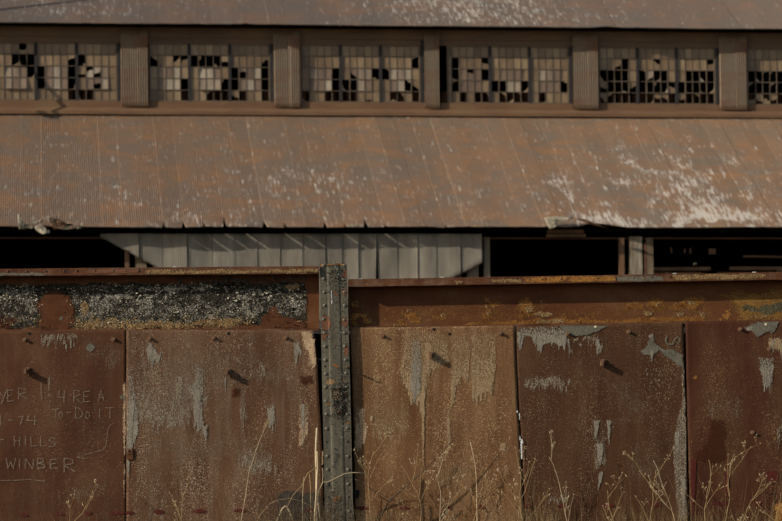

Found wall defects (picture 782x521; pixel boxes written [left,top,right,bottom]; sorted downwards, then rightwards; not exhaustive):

corrosion [36,289,252,330]
peeling [0,272,309,330]
corrosion [351,274,782,326]